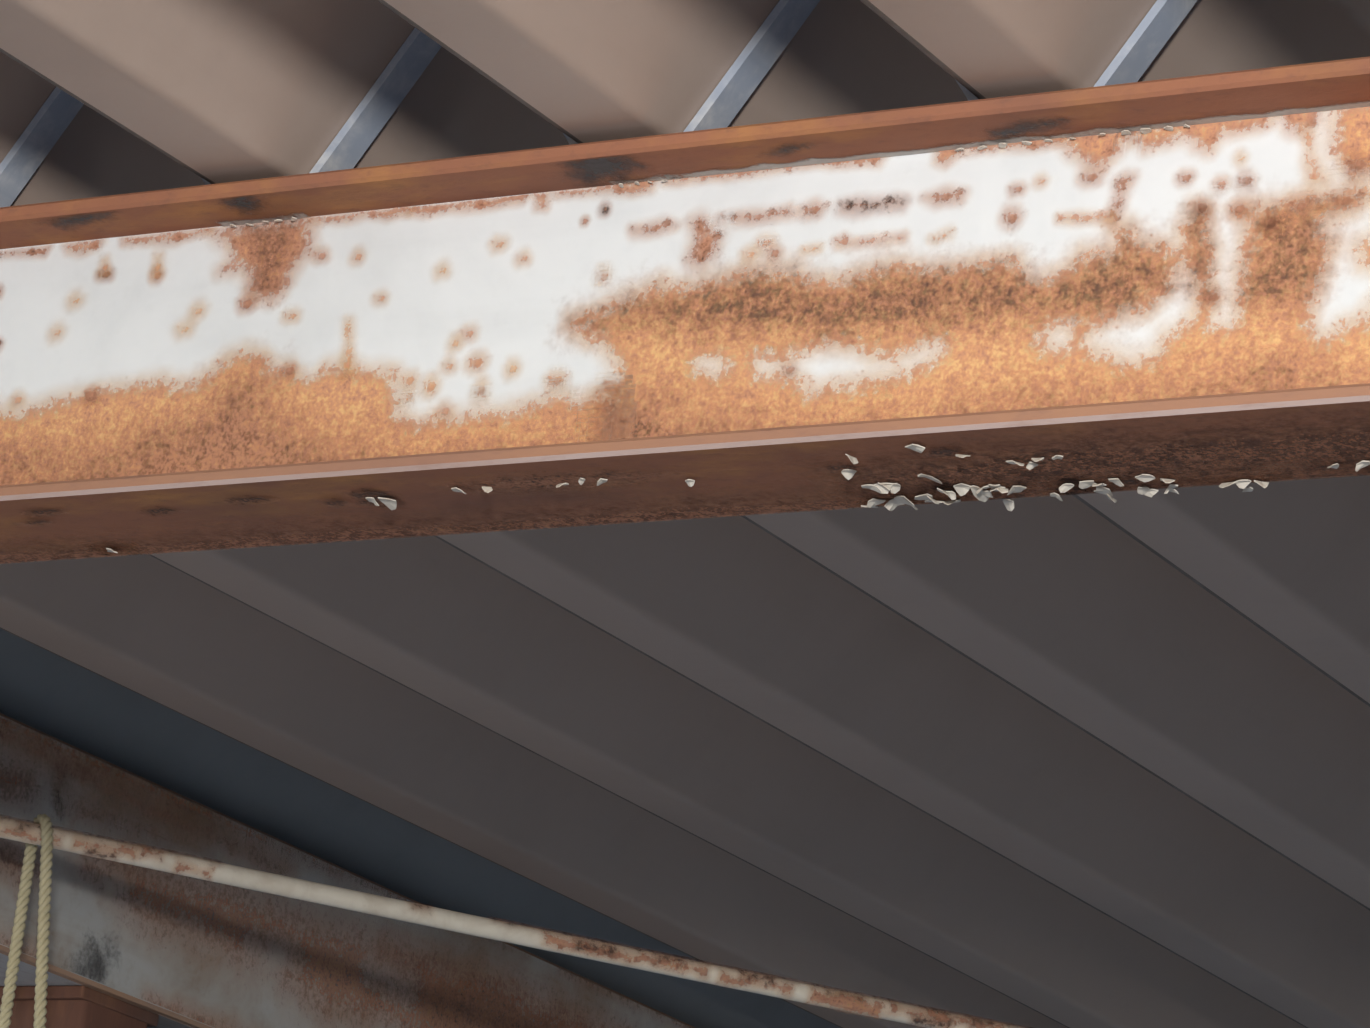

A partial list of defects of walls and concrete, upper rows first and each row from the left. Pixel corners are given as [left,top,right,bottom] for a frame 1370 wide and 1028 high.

corrosion [0,106,1370,486]
corrosion [0,422,1370,564]
peeling [827,444,1282,511]
peeling [1327,456,1370,472]
corrosion [0,814,220,883]
corrosion [493,918,1032,1028]